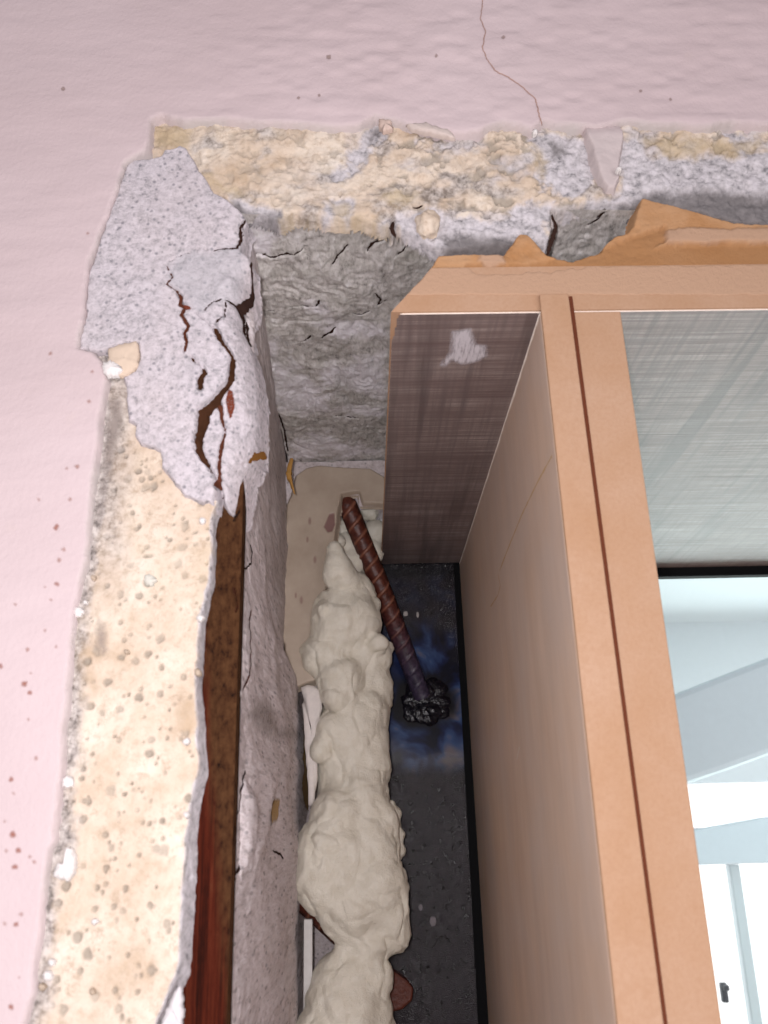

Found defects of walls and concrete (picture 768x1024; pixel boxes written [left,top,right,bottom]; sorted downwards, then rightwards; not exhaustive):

crack [480,0,542,125]
crack [332,205,423,264]
flaking render [152,119,768,263]
crack [546,215,557,256]
crack [166,220,302,491]
crack [304,293,386,341]
flaking render [29,146,271,1024]